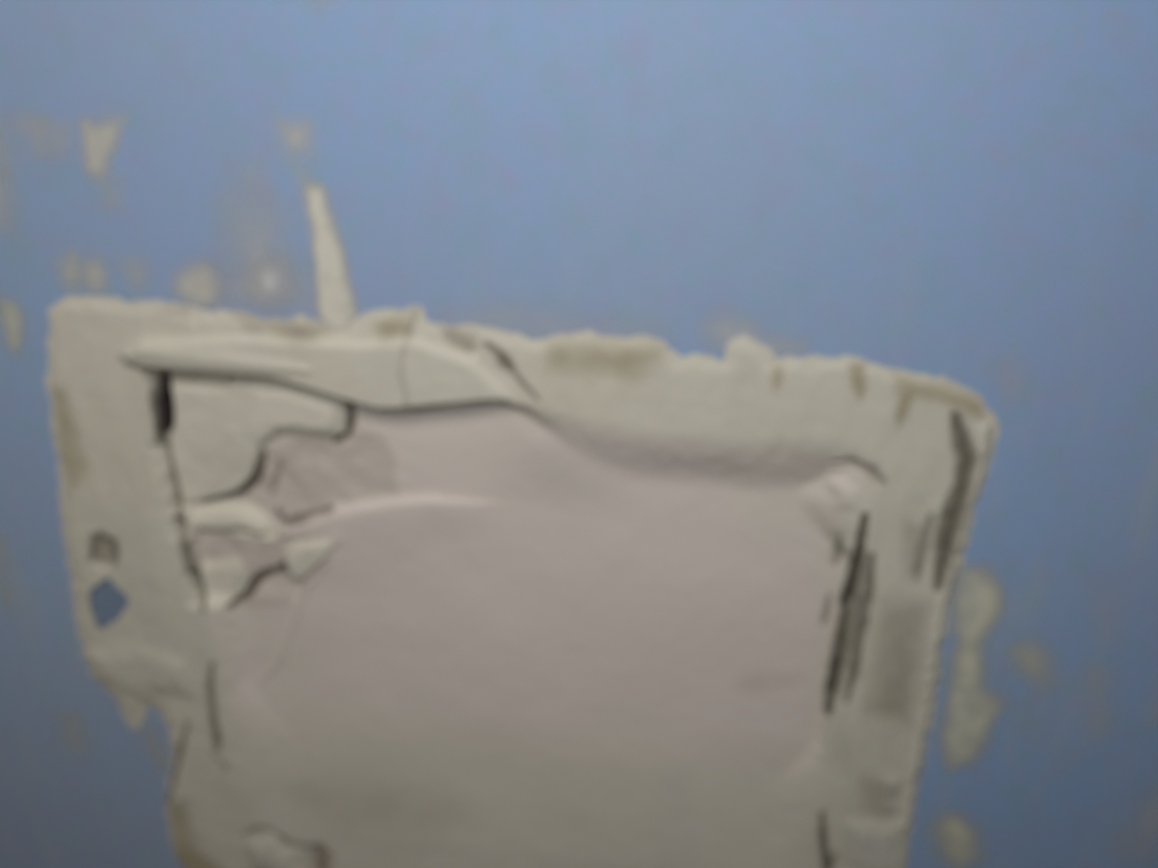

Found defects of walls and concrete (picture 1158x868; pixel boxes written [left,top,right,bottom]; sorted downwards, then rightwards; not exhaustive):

crack [134,365,287,607]
flaking render [170,371,400,609]
crack [334,400,355,442]
crack [935,414,973,590]
flaking render [92,579,129,628]
crack [824,513,874,714]